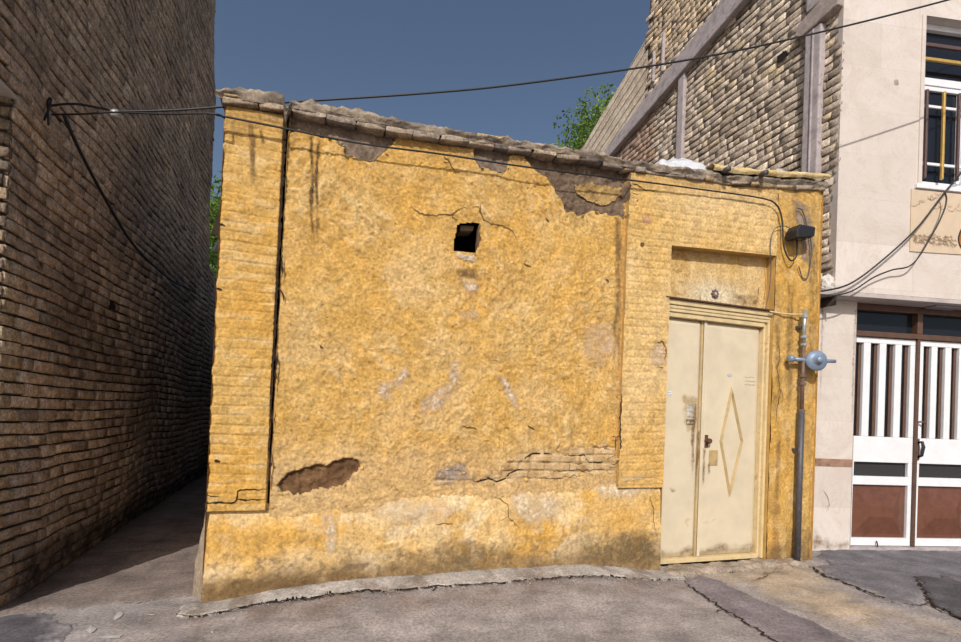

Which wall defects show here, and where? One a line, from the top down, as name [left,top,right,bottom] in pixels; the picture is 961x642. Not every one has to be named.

spalling [289,115,396,162]
spalling [474,148,510,173]
damp [309,137,319,227]
spalling [525,157,632,219]
crack [412,206,516,237]
crack [205,122,287,504]
spalling [278,458,363,495]
efflorescence [511,493,557,522]
damp [207,572,367,600]